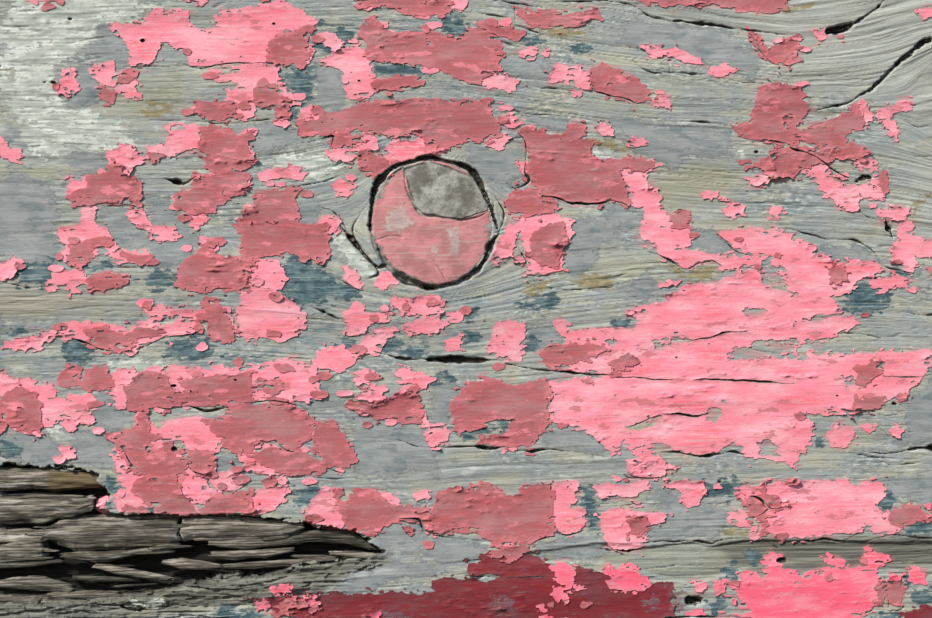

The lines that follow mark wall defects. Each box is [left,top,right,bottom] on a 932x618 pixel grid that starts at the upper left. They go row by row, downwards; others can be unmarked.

peeling [512,5,604,31]
peeling [638,0,790,15]
peeling [616,18,812,81]
crack [825,0,885,35]
crack [818,38,932,110]
peeling [730,81,889,212]
peeling [372,160,491,291]
peeling [310,301,430,373]
peeling [390,293,481,337]
peeling [444,331,483,352]
crack [377,352,605,376]
peeling [683,545,932,618]